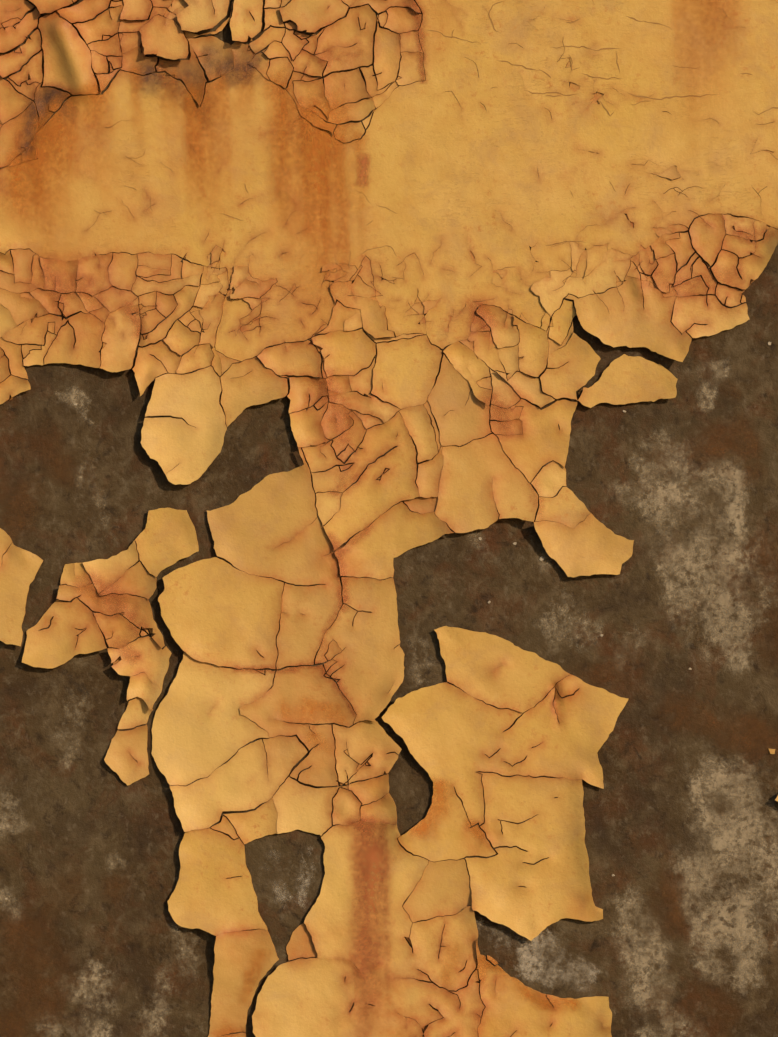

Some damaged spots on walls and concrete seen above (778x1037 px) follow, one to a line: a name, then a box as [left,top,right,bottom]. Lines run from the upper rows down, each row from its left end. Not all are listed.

crack [429,0,718,116]
corrosion [306,102,341,229]
water stain [636,459,696,523]
peeling [0,214,778,1037]
water stain [657,461,760,669]
water stain [675,761,778,986]
water stain [518,933,554,981]
water stain [616,898,665,1004]